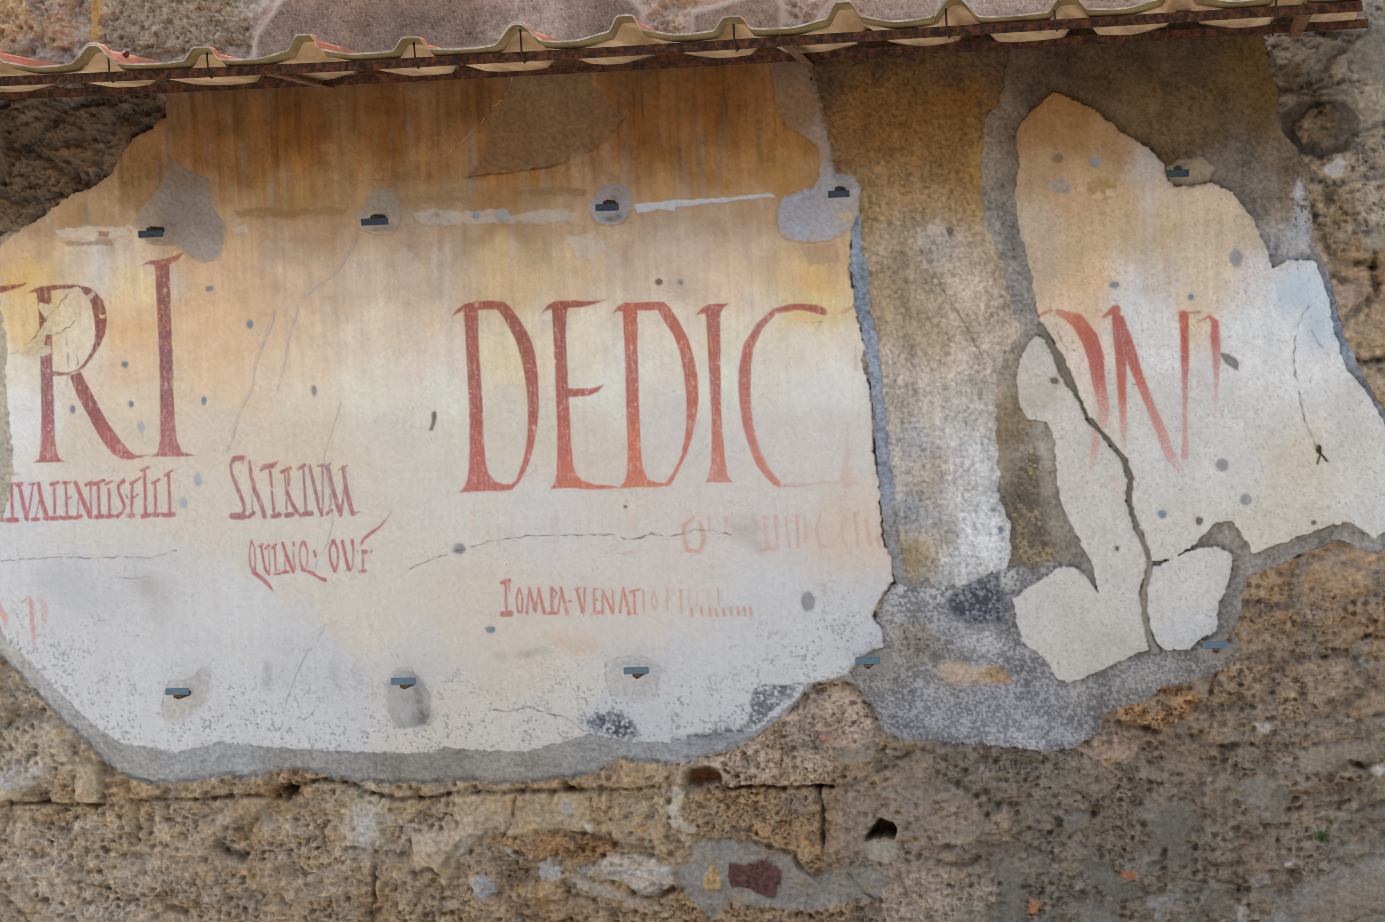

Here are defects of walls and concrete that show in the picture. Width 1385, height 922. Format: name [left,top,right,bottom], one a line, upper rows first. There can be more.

crack [409,529,732,570]
crack [1035,321,1161,656]